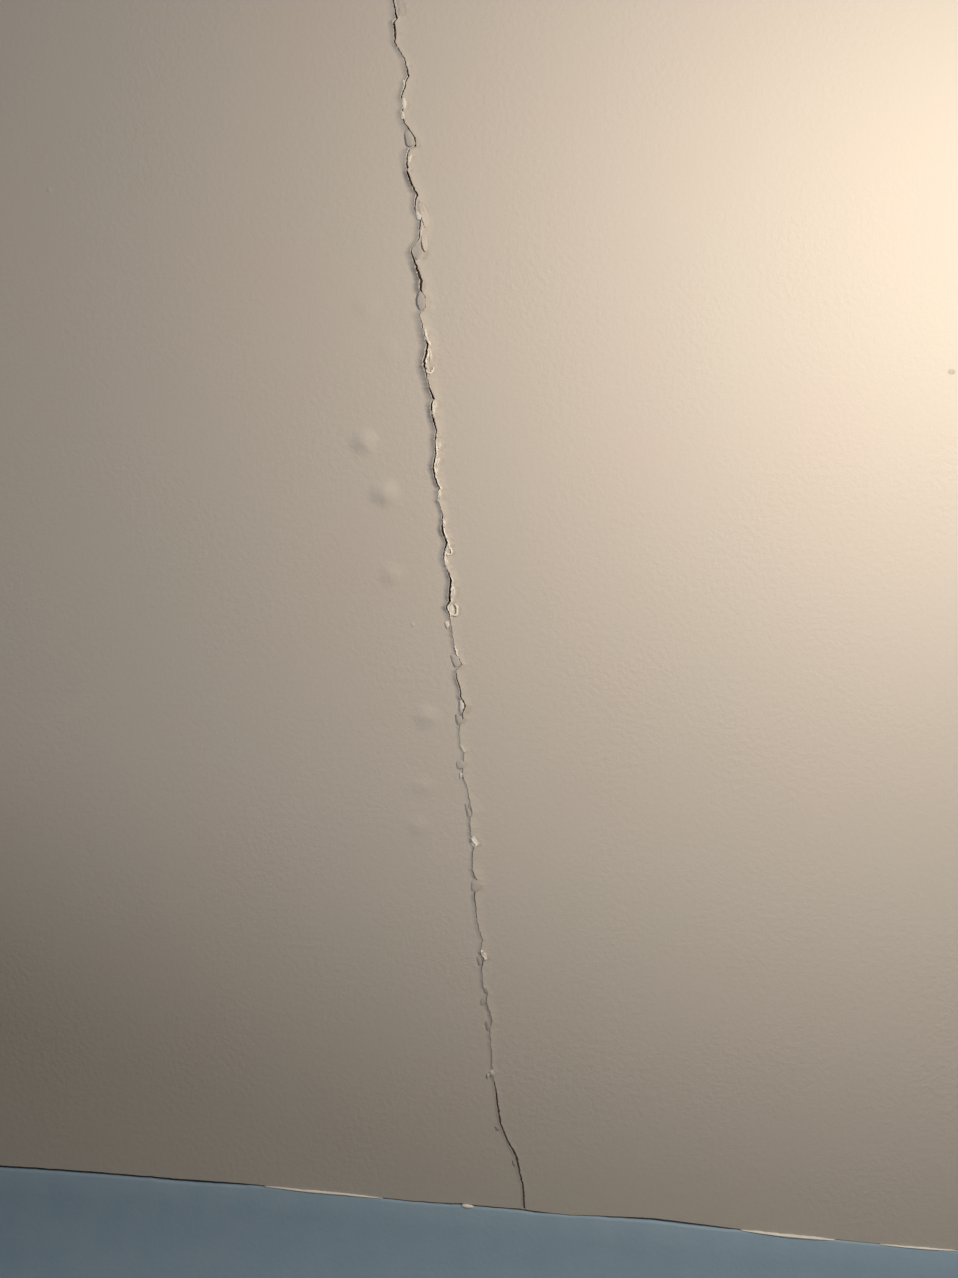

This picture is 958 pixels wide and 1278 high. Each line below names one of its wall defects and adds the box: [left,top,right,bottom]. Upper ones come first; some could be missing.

crack [387,0,531,1210]